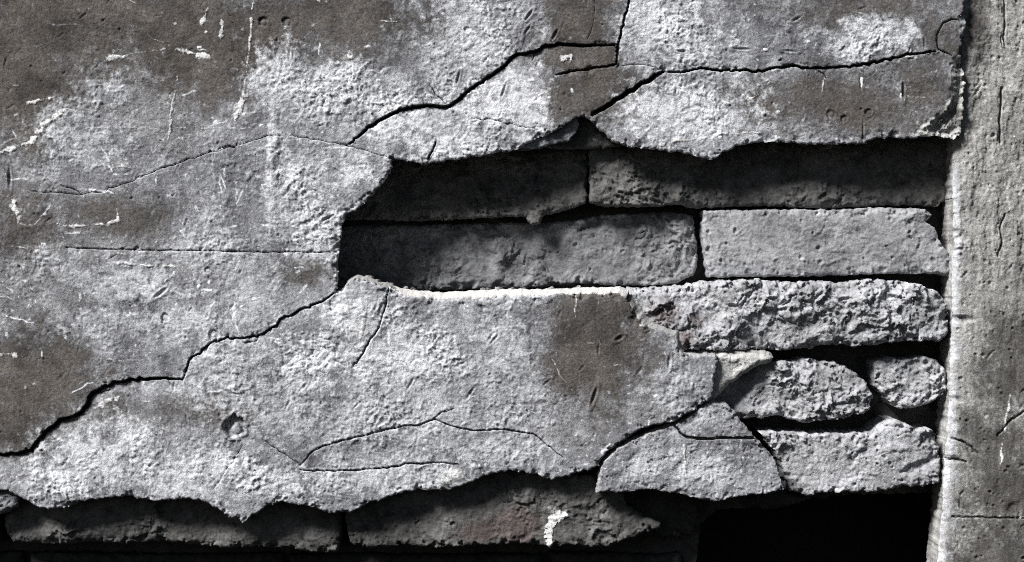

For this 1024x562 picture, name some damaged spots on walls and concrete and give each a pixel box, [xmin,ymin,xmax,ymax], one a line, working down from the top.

flaking render [507,116,668,152]
crack [343,0,957,147]
crack [0,292,336,456]
spalling [336,247,811,496]
flaking render [0,490,20,514]
crack [268,427,450,471]